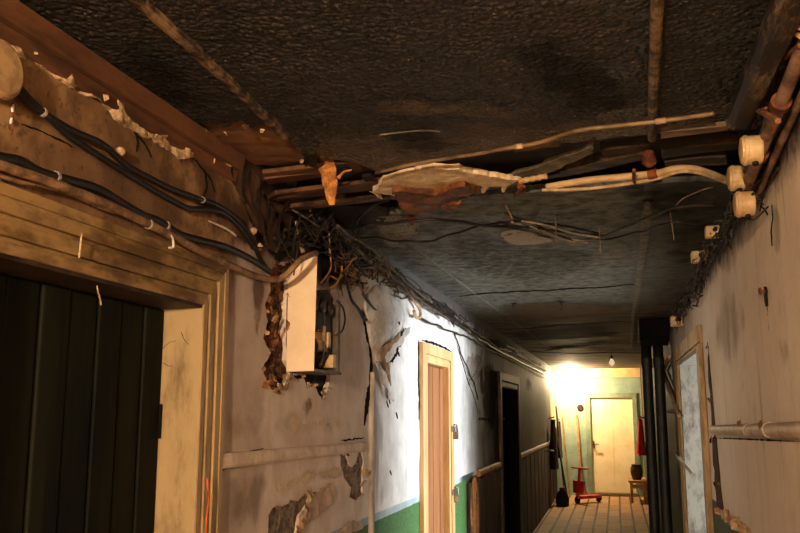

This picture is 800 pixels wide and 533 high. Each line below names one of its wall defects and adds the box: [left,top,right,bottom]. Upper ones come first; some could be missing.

flaking render [11,45,194,159]
flaking render [369,139,594,199]
flaking render [261,258,332,399]
crack [341,309,493,441]
flaking render [268,487,315,533]
flaking render [340,450,369,500]